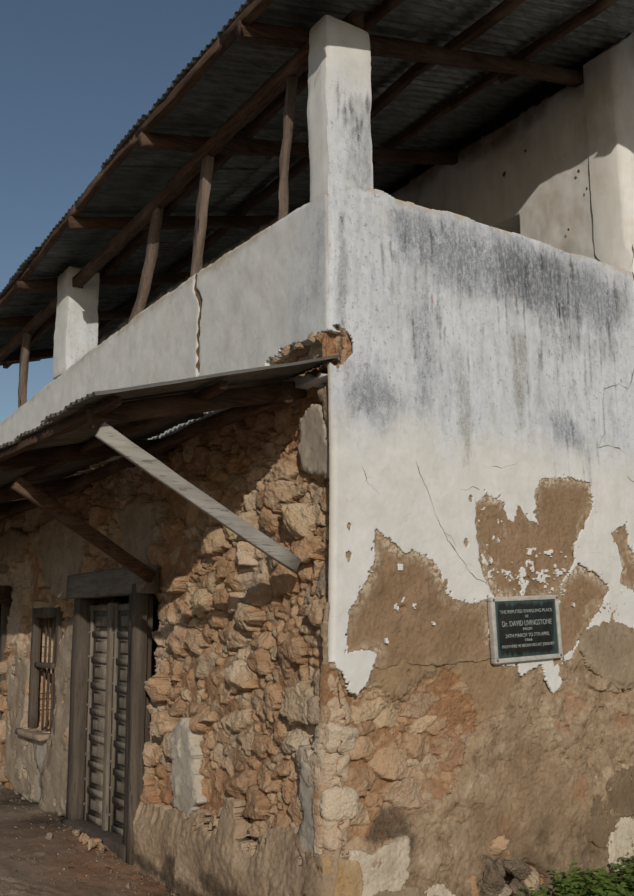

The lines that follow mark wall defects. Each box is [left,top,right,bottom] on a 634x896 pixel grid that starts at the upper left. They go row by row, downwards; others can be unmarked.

crack [194,273,202,371]
water stain [395,211,623,328]
spalling [0,507,74,795]
spalling [55,325,609,867]
crack [416,462,488,585]
peeling [611,525,634,593]
spalling [582,765,634,848]
water stain [131,852,237,896]